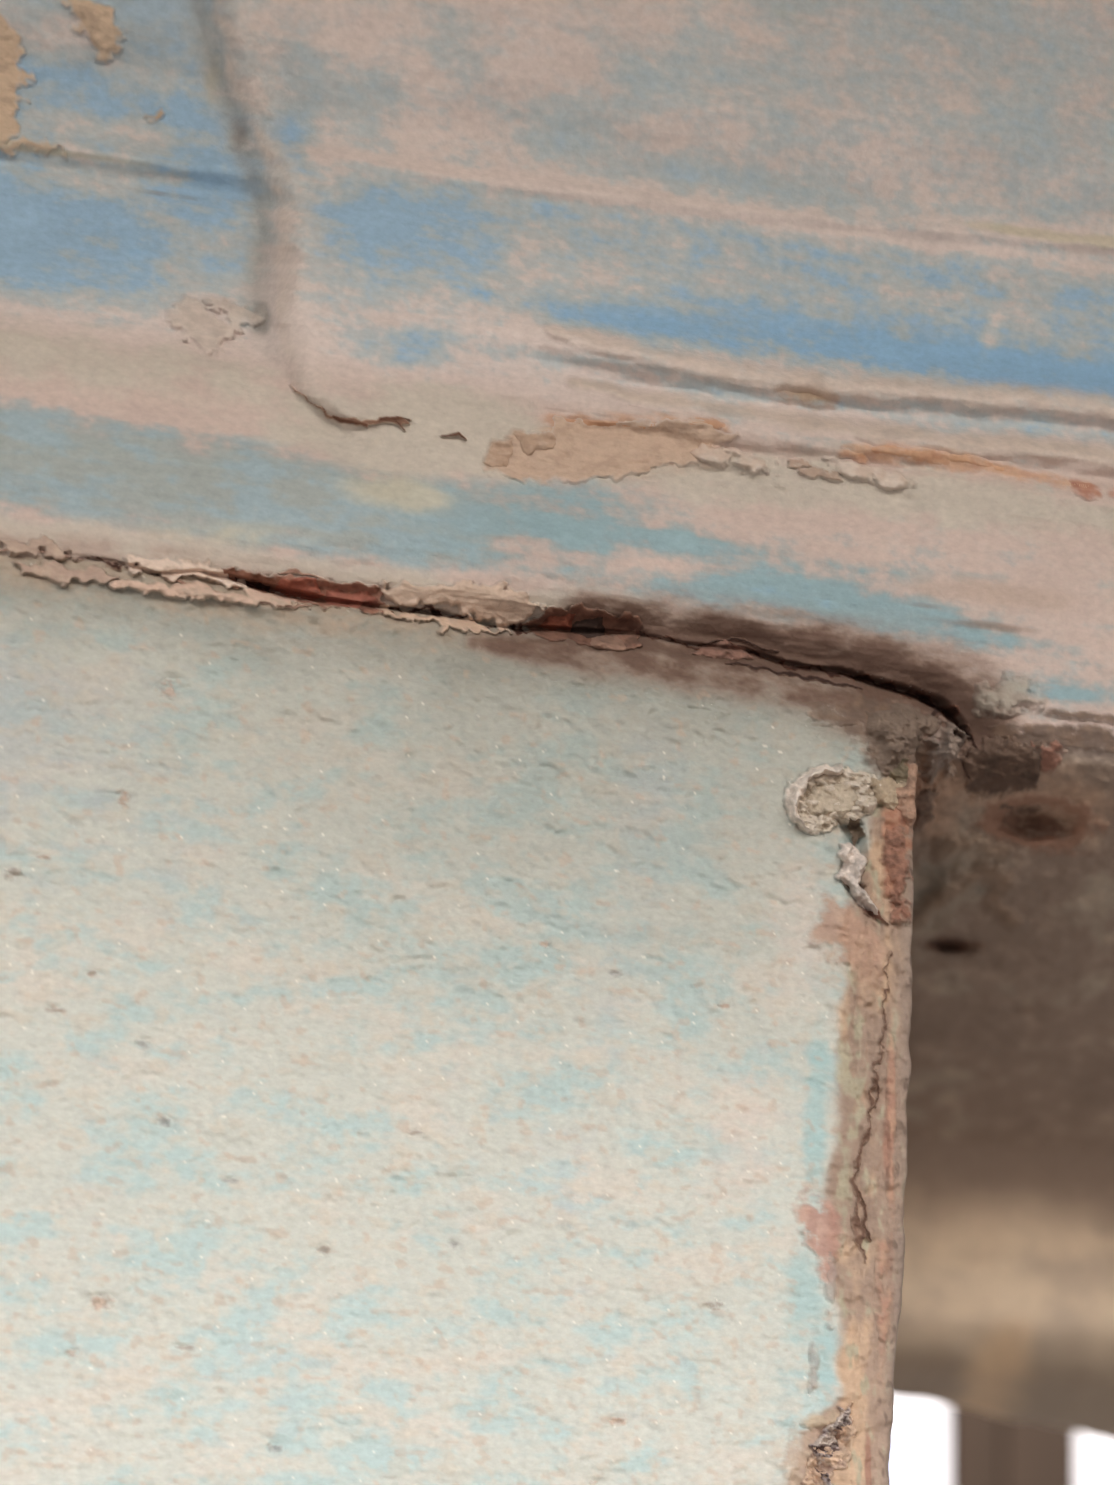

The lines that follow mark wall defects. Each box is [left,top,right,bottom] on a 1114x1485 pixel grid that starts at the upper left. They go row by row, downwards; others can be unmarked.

peeling [58,0,129,65]
peeling [0,12,69,163]
spalling [479,415,918,492]
crack [0,547,226,593]
peeling [0,533,643,652]
crack [259,566,531,636]
spalling [691,639,754,661]
leakage [459,570,1114,805]
crack [639,631,979,778]
rust [967,789,1114,861]
crack [848,950,894,1264]
spalling [799,1401,858,1485]